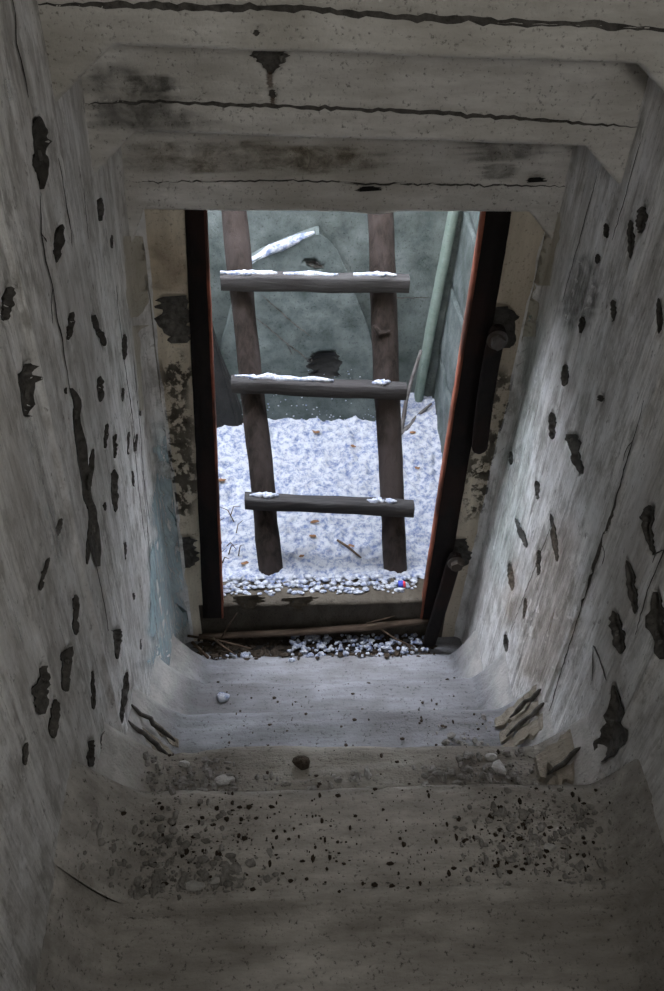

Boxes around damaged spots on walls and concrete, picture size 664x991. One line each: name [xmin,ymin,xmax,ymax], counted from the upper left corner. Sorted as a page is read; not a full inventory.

crack [12,0,664,98]
spalling [32,116,52,189]
crack [86,99,640,240]
spalling [64,387,138,567]
spalling [31,595,80,739]
spalling [494,685,543,747]
spalling [534,729,576,785]
spalling [593,685,628,762]
spalling [608,611,626,654]
spalling [625,560,664,659]